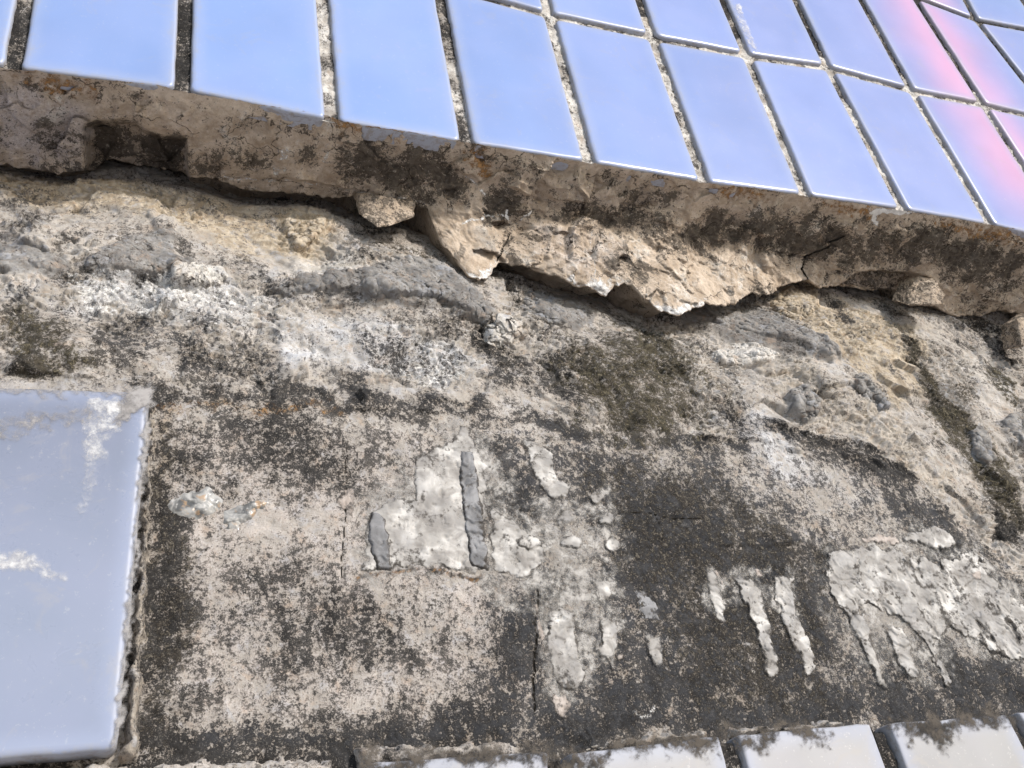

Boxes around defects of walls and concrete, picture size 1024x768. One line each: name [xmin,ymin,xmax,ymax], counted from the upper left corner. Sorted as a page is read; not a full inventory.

water stain [0,305,200,745]
spalling [0,68,1024,590]
peeling [0,387,1024,768]
water stain [547,314,858,717]
crack [801,235,846,280]
water stain [909,329,1024,527]